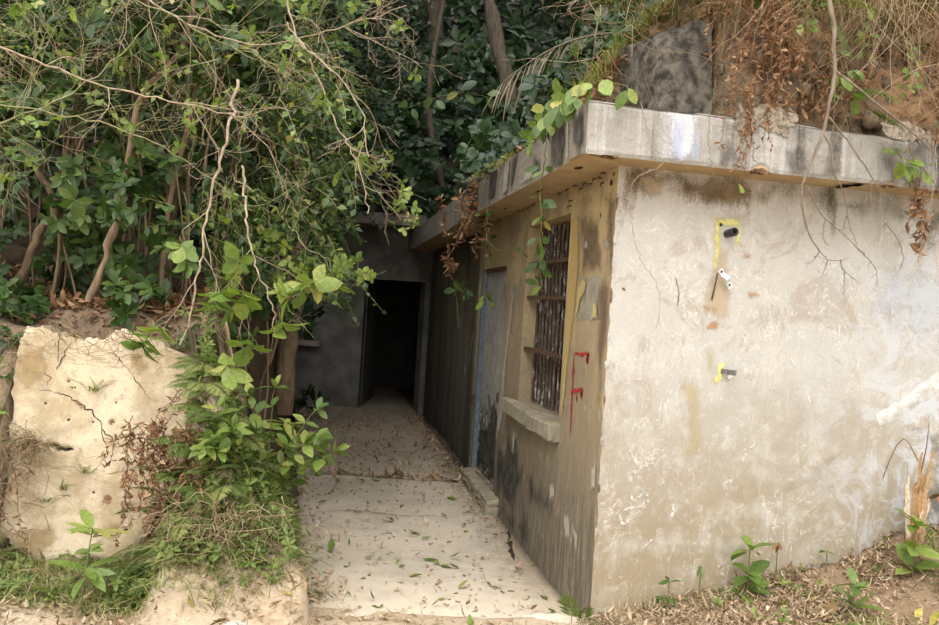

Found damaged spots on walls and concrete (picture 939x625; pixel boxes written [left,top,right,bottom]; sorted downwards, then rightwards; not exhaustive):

damp [684,181,751,201]
damp [713,218,740,270]
damp [561,200,612,415]
damp [478,405,533,500]